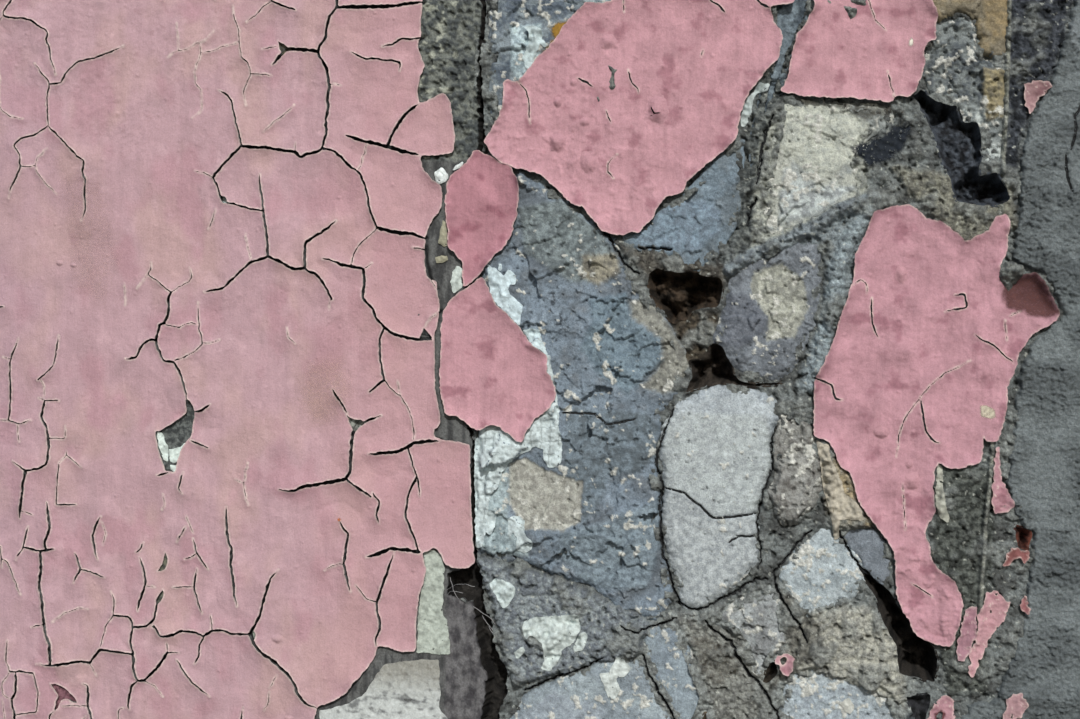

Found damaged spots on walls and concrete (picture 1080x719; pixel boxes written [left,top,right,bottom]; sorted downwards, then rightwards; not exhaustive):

crack [5,16,59,85]
peeling [1024,80,1053,114]
peeling [420,0,938,442]
crack [128,0,441,640]
peeling [156,400,198,472]
crack [562,412,636,425]
peeling [813,204,1060,677]
crack [621,409,813,719]
crack [839,530,870,576]
crack [11,573,315,719]
peeling [775,654,795,676]
peeling [927,695,955,719]